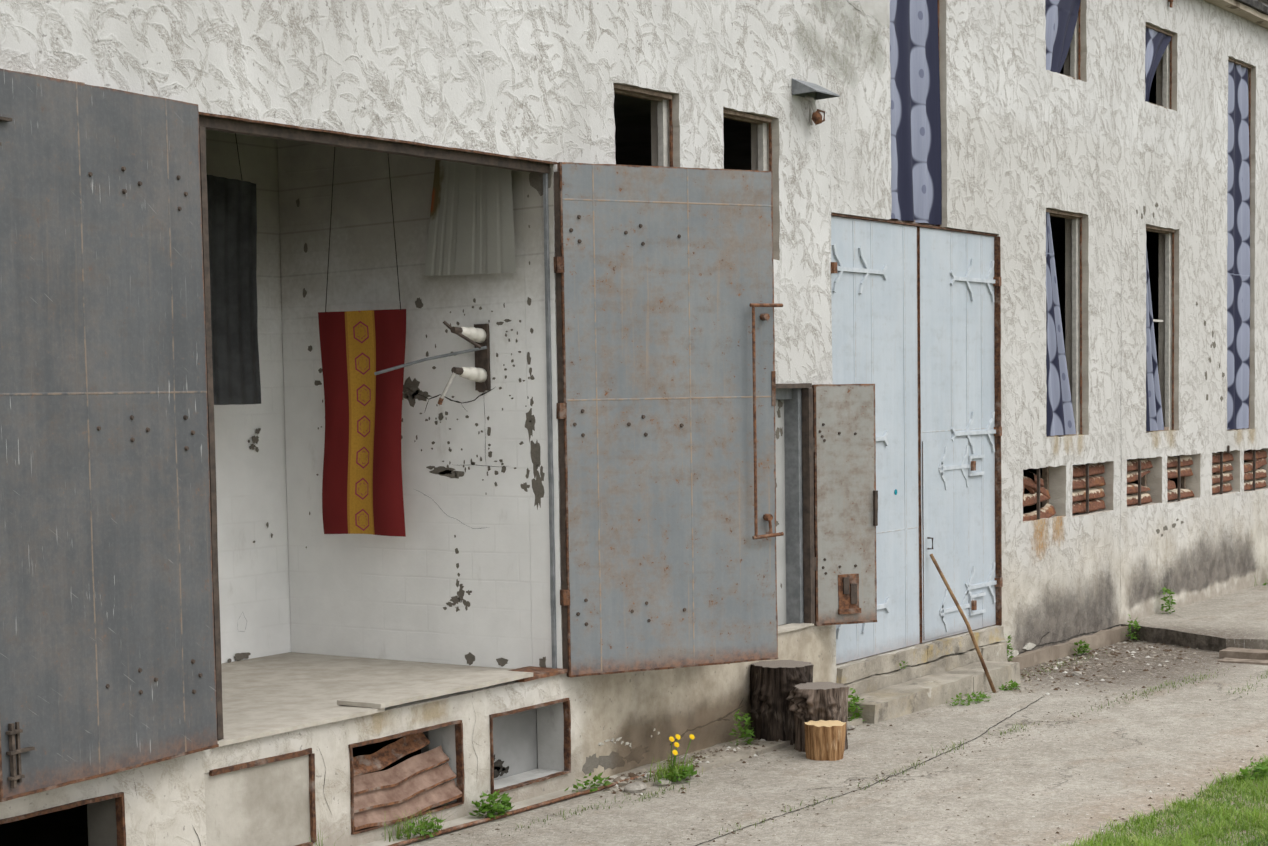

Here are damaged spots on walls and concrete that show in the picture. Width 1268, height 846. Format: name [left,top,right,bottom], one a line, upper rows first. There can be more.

peeling [401,298,545,510]
peeling [443,535,472,612]
water stain [1130,542,1255,606]
water stain [1015,577,1114,655]